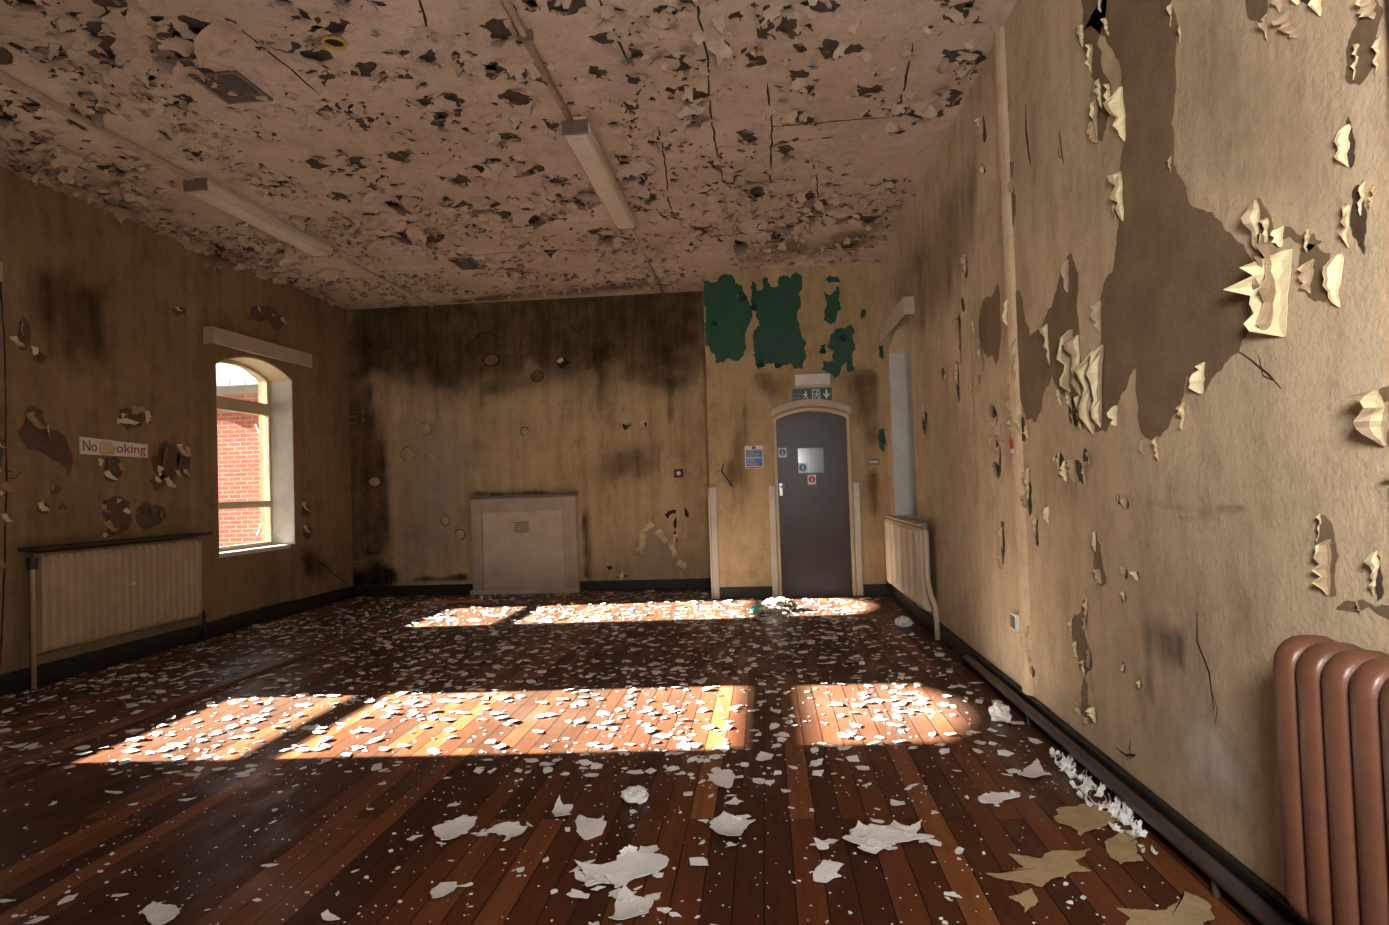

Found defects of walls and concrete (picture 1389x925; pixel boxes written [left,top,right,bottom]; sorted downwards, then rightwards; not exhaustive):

peeling [1345,0,1384,85]
peeling [941,0,1376,488]
peeling [1347,386,1389,446]
peeling [995,521,1005,570]
peeling [1020,467,1049,547]
peeling [1091,531,1140,602]
peeling [1311,513,1389,619]